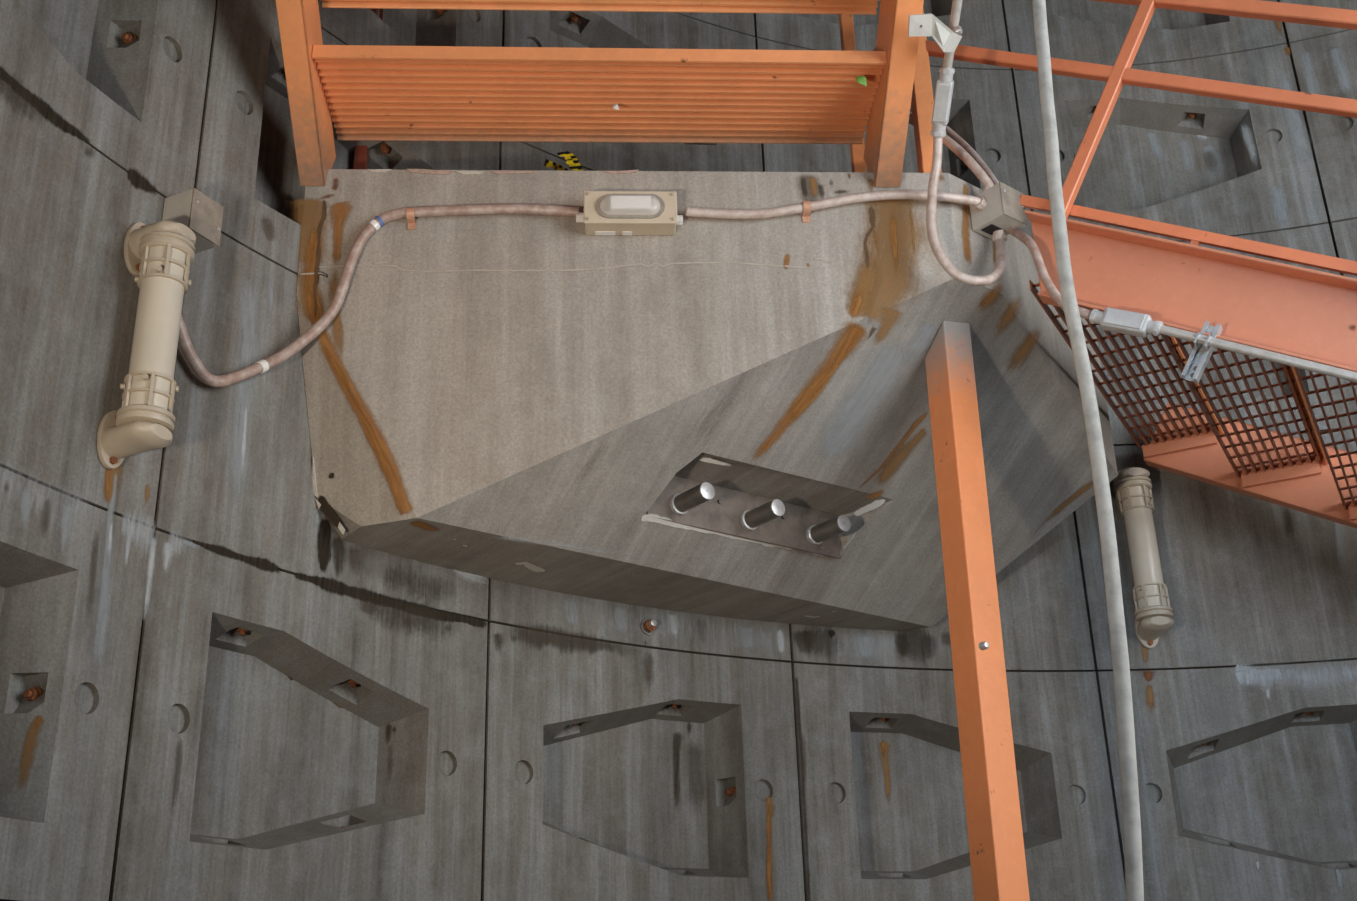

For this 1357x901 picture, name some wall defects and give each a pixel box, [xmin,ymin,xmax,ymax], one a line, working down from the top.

rust [756,180,924,455]
rust [295,179,437,531]
rust [1142,645,1154,708]
rust [21,716,43,784]
rust [879,741,890,796]